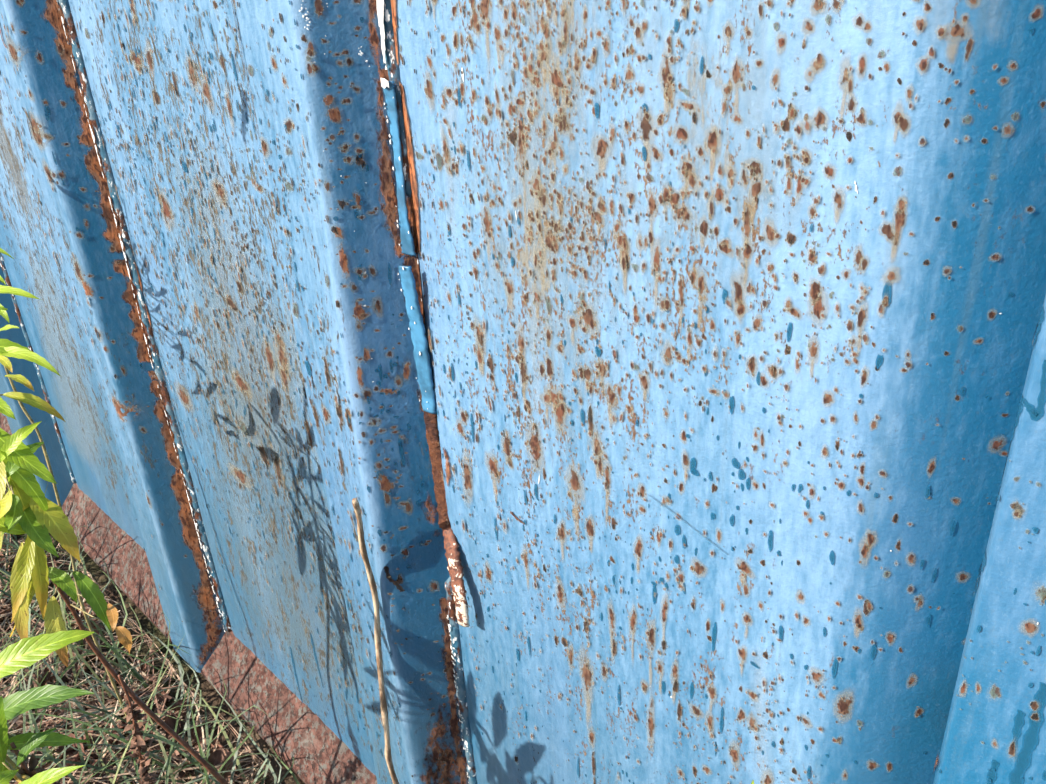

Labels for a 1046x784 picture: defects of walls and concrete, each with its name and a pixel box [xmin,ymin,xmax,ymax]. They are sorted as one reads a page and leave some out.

corrosion [916,3,931,31]
corrosion [918,47,934,71]
corrosion [938,0,976,84]
corrosion [885,89,917,138]
corrosion [881,189,913,257]
corrosion [0,0,437,753]
peeling [376,0,471,783]
corrosion [330,0,888,784]